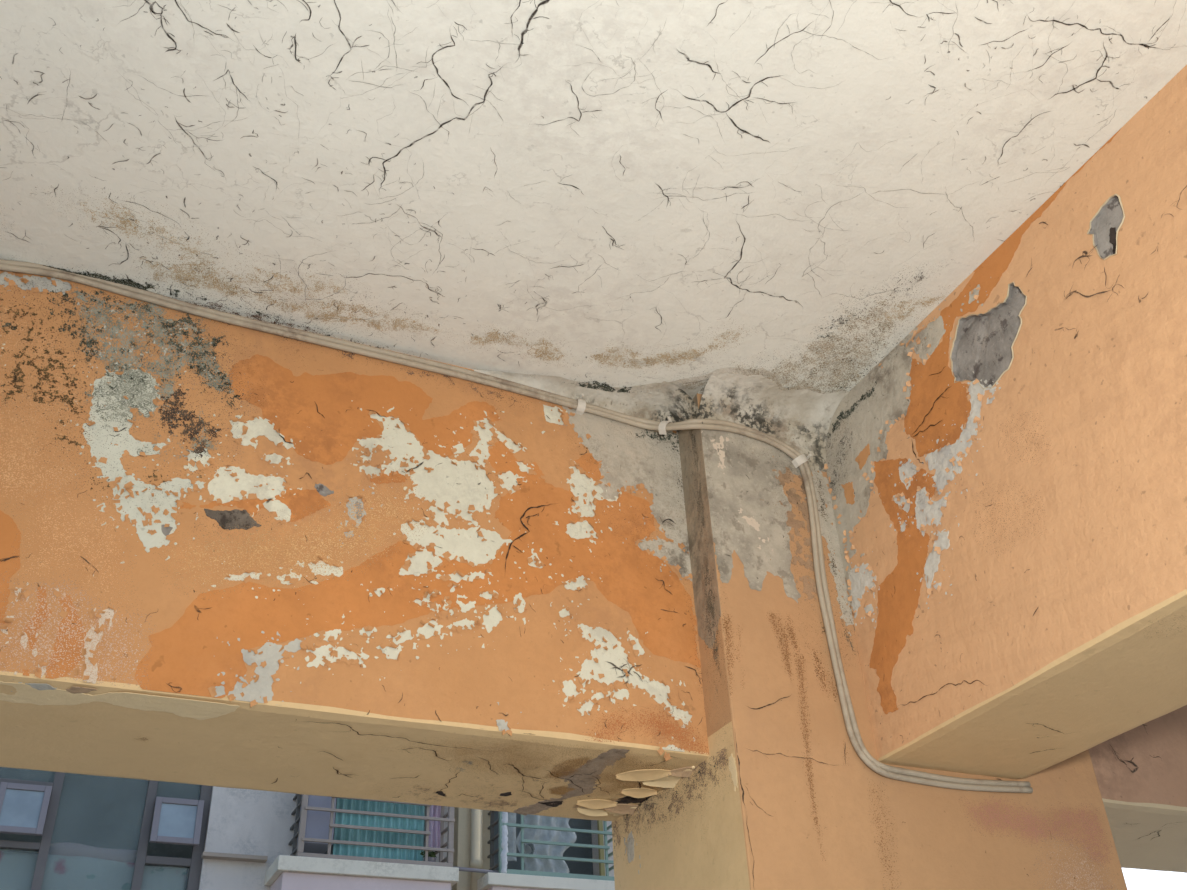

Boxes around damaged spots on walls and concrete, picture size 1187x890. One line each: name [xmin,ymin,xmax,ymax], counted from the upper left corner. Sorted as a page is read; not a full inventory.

crack [145,0,229,52]
crack [256,0,369,90]
crack [363,0,549,241]
crack [643,22,812,142]
crack [982,0,1169,185]
crack [683,181,802,320]
damp [0,196,440,689]
peeling [0,130,1125,816]
damp [576,381,642,393]
damp [590,328,749,370]
damp [635,429,745,696]
damp [729,272,946,493]